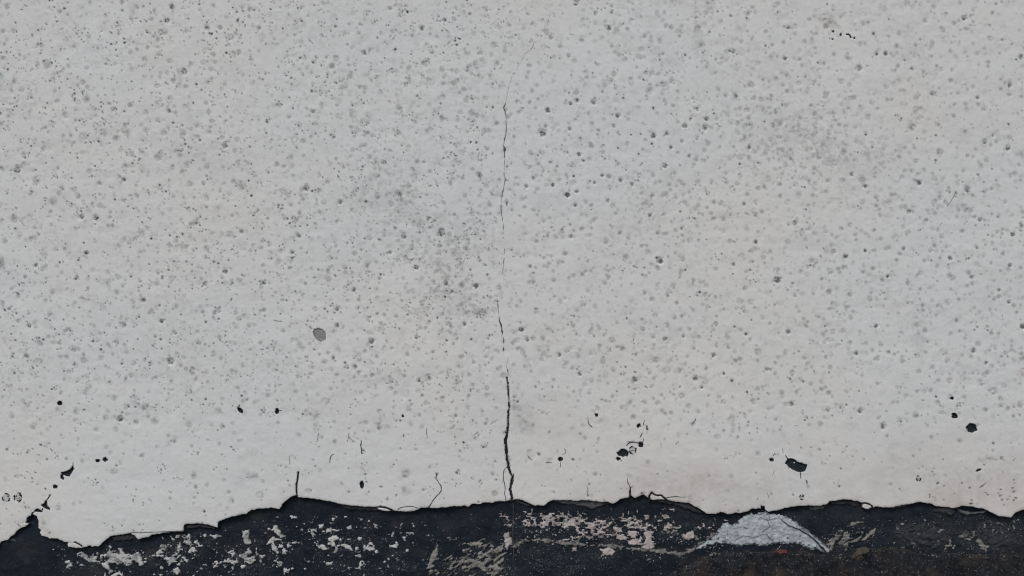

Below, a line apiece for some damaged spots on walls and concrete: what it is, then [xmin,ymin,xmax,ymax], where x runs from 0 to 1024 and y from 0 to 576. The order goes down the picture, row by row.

crack [497,12,566,556]
spalling [0,464,1024,576]
spalling [616,443,643,460]
spalling [770,453,807,478]